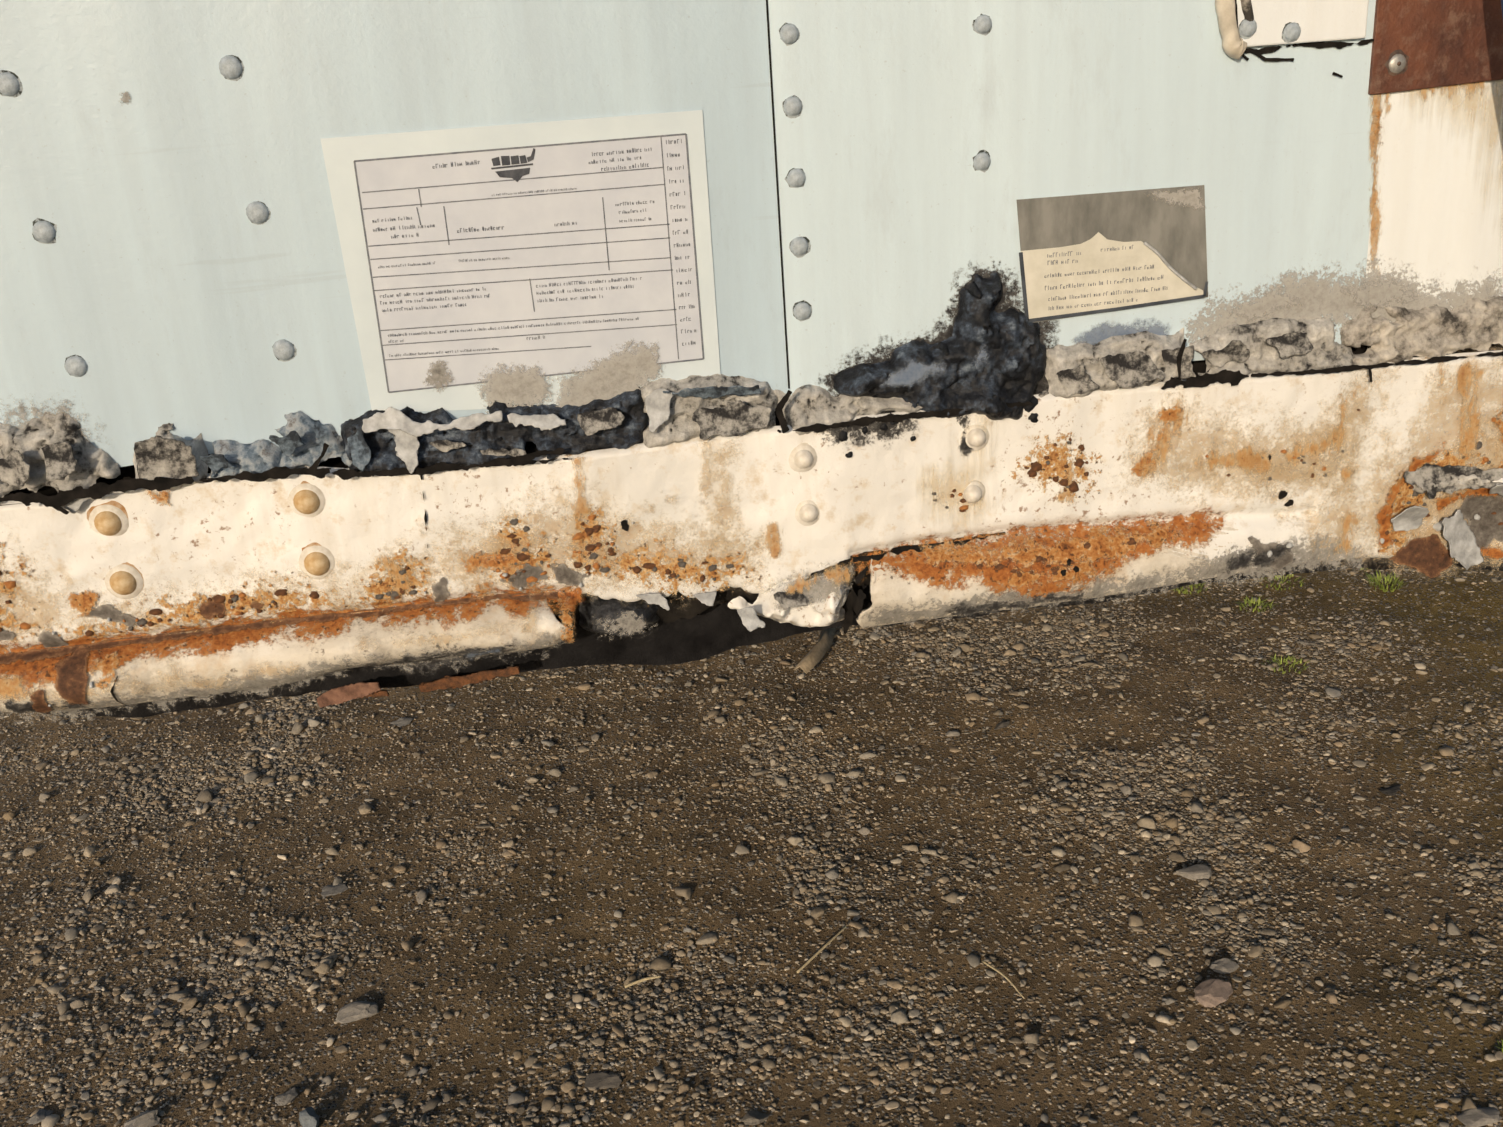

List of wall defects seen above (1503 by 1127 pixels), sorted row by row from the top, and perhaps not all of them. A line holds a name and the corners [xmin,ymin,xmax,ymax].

peeling [1162,340,1250,382]
peeling [1266,331,1314,359]
peeling [0,441,77,487]
peeling [388,429,526,474]
peeling [507,407,625,436]
peeling [644,385,761,433]
rust [956,414,973,456]
rust [1131,400,1188,478]
rust [1195,394,1361,507]
rust [1336,357,1503,567]
rust [0,451,1224,699]
crack [110,676,131,707]